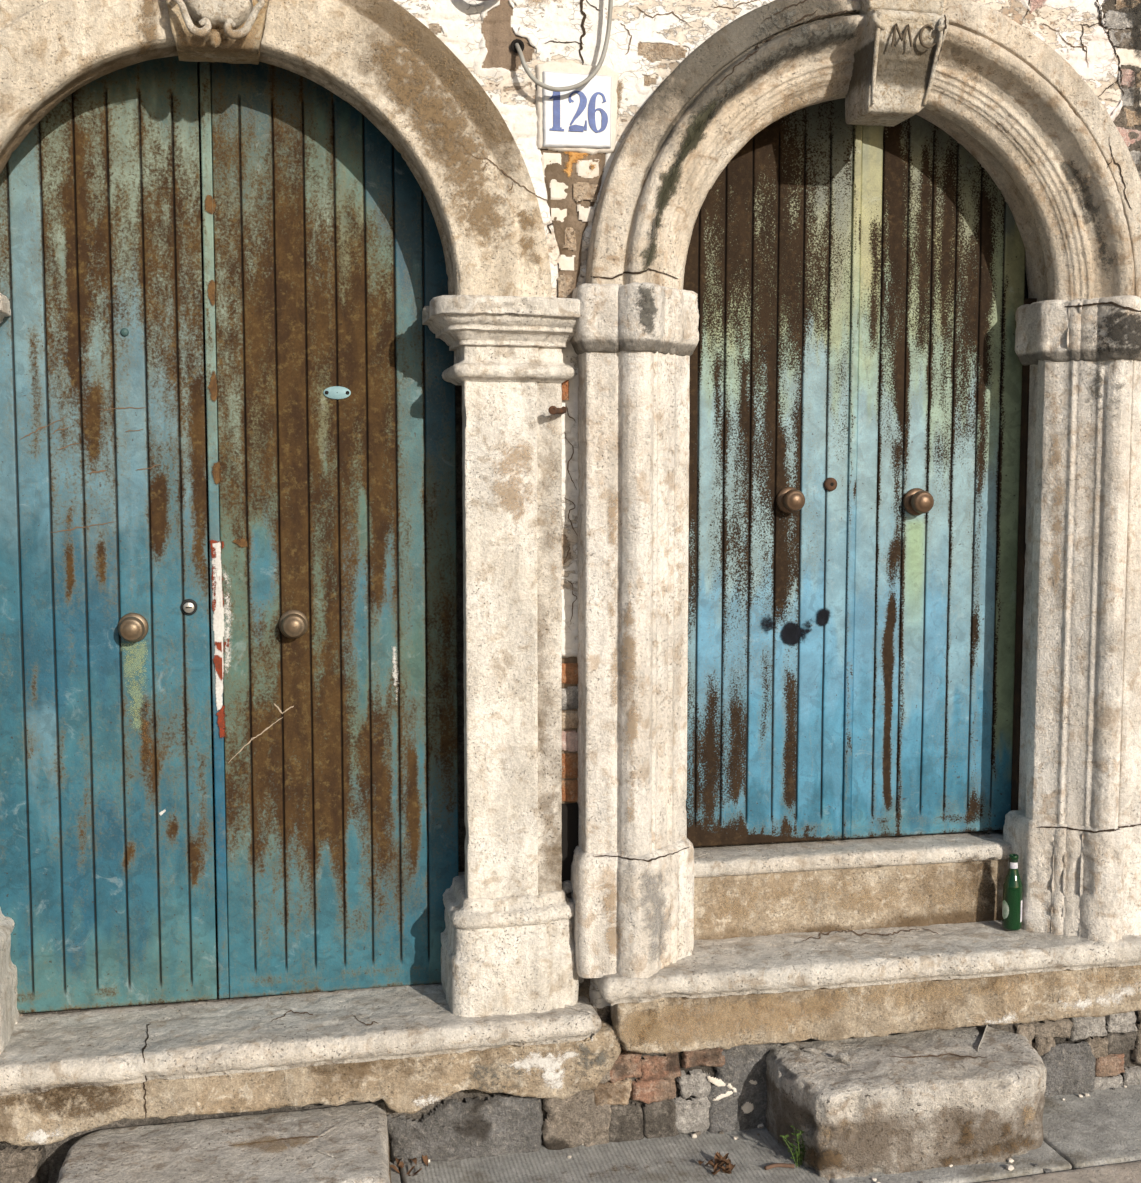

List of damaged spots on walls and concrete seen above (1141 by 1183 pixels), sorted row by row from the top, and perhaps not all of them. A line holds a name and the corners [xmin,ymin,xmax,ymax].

damp [642,0,857,270]
crack [1024,0,1124,97]
spalling [1095,0,1141,179]
spalling [540,149,606,298]
damp [1061,161,1112,272]
damp [636,284,658,336]
rust [212,462,222,484]
rust [123,643,152,763]
damp [0,1083,127,1118]
crack [142,1024,150,1118]